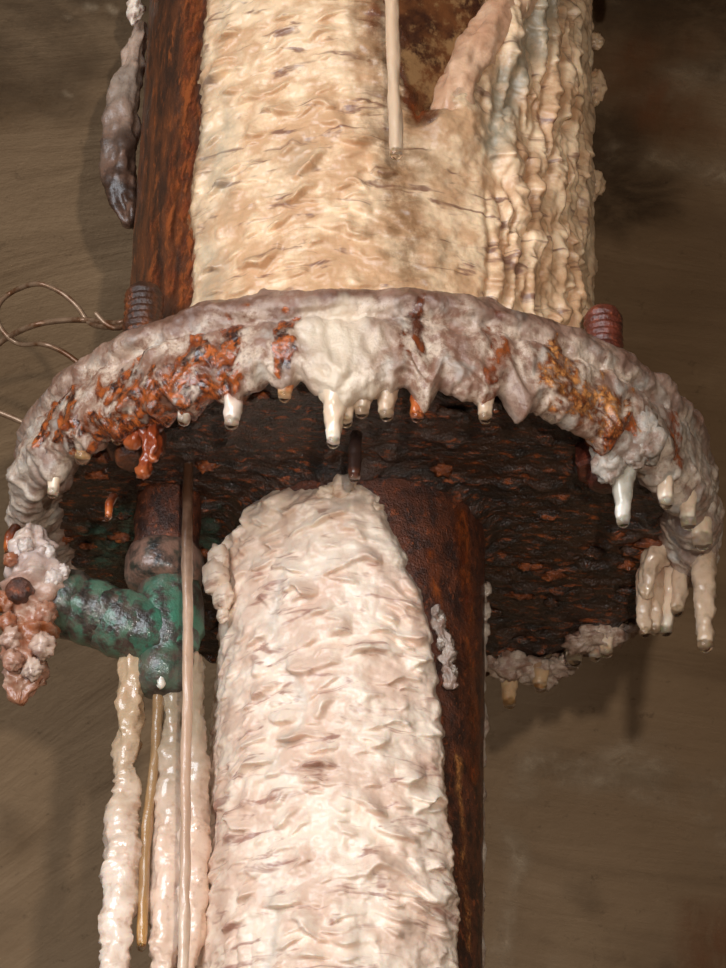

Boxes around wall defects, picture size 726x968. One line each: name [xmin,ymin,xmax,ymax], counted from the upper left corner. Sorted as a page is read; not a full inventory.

corrosion [148,0,205,307]
corrosion [32,304,252,456]
corrosion [271,306,301,379]
leakage [0,0,726,710]
corrosion [399,294,426,356]
corrosion [482,311,511,405]
corrosion [538,333,642,455]
corrosion [667,411,683,468]
leakage [195,430,461,968]